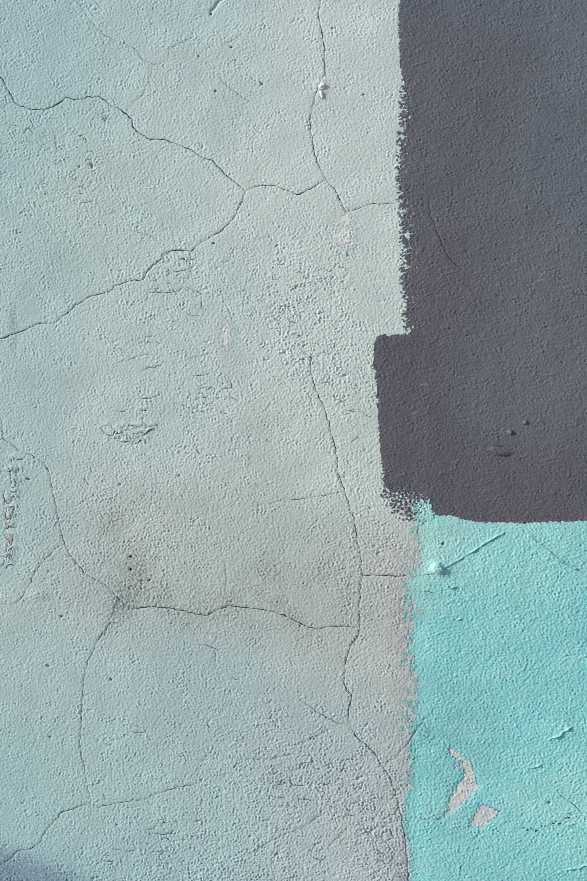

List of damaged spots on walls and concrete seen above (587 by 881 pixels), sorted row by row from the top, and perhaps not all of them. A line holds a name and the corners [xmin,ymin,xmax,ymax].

crack [0,1,394,339]
peeling [3,457,30,568]
crack [0,263,587,880]
peeling [438,748,480,820]
peeling [468,804,500,828]